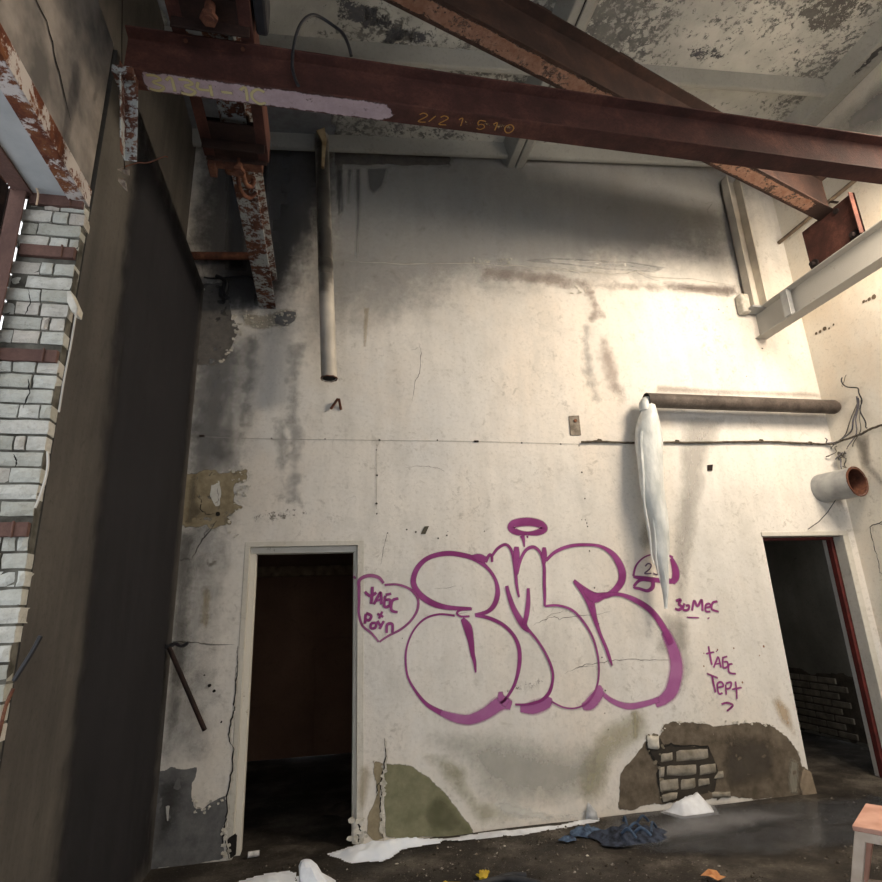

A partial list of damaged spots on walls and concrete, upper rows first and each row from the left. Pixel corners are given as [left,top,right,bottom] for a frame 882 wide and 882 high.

peeling [688,46,725,61]
peeling [794,0,868,33]
spalling [844,46,882,82]
flaking render [197,282,297,365]
damp [194,354,239,474]
flaking render [182,469,251,538]
flaking render [788,667,868,744]
flaking render [151,767,227,869]
crack [173,641,239,860]
crack [376,738,388,840]
spalling [618,719,817,810]